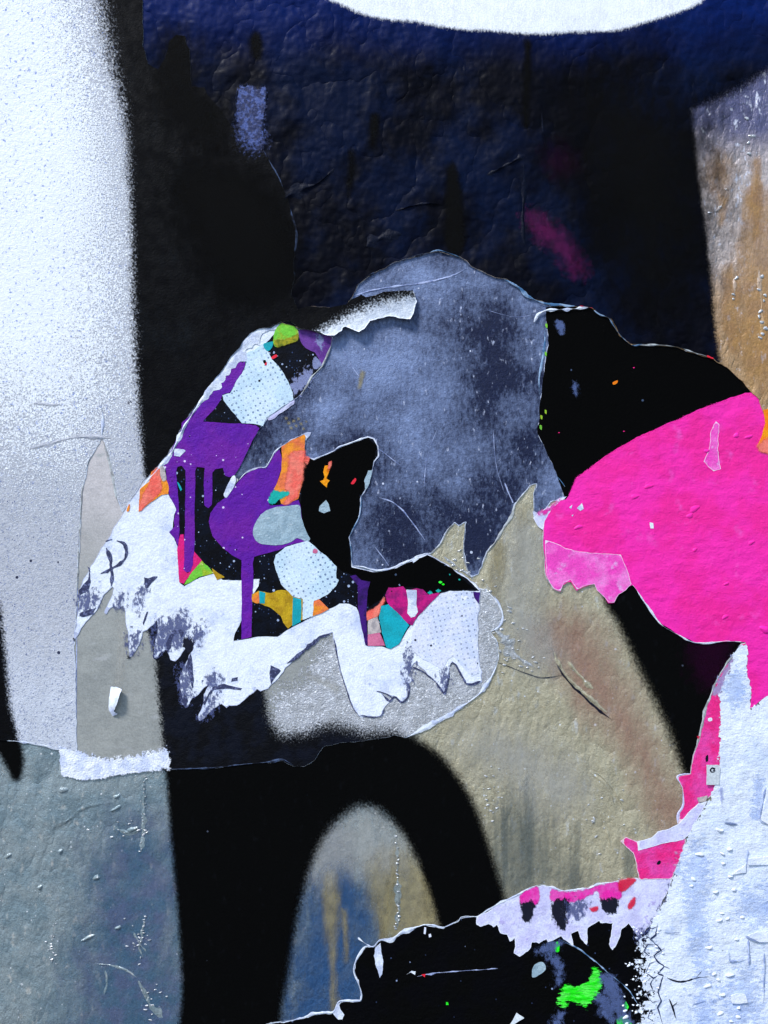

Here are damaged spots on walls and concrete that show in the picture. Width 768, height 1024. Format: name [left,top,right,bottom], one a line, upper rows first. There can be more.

peeling [444,541,497,598]
crack [500,649,612,720]
peeling [760,788,768,824]
peeling [731,993,748,1004]